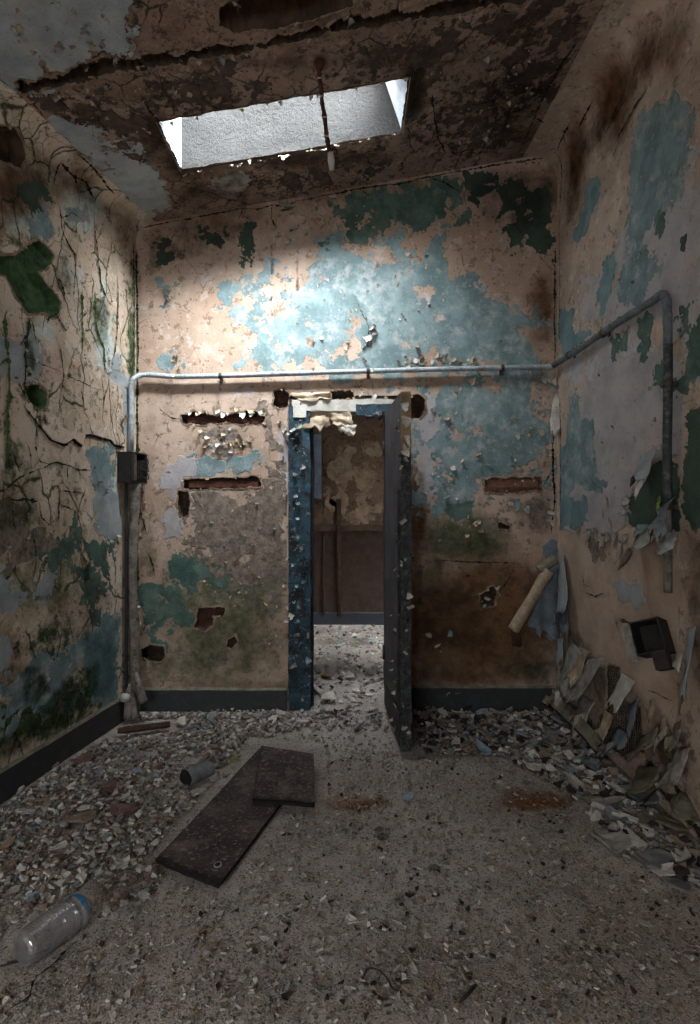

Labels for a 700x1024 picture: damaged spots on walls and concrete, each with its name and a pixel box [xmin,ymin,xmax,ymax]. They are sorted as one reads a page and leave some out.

peeling [0,0,579,219]
peeling [148,237,178,314]
peeling [154,347,185,377]
peeling [136,387,310,665]
crack [0,43,646,589]
peeling [182,89,700,841]